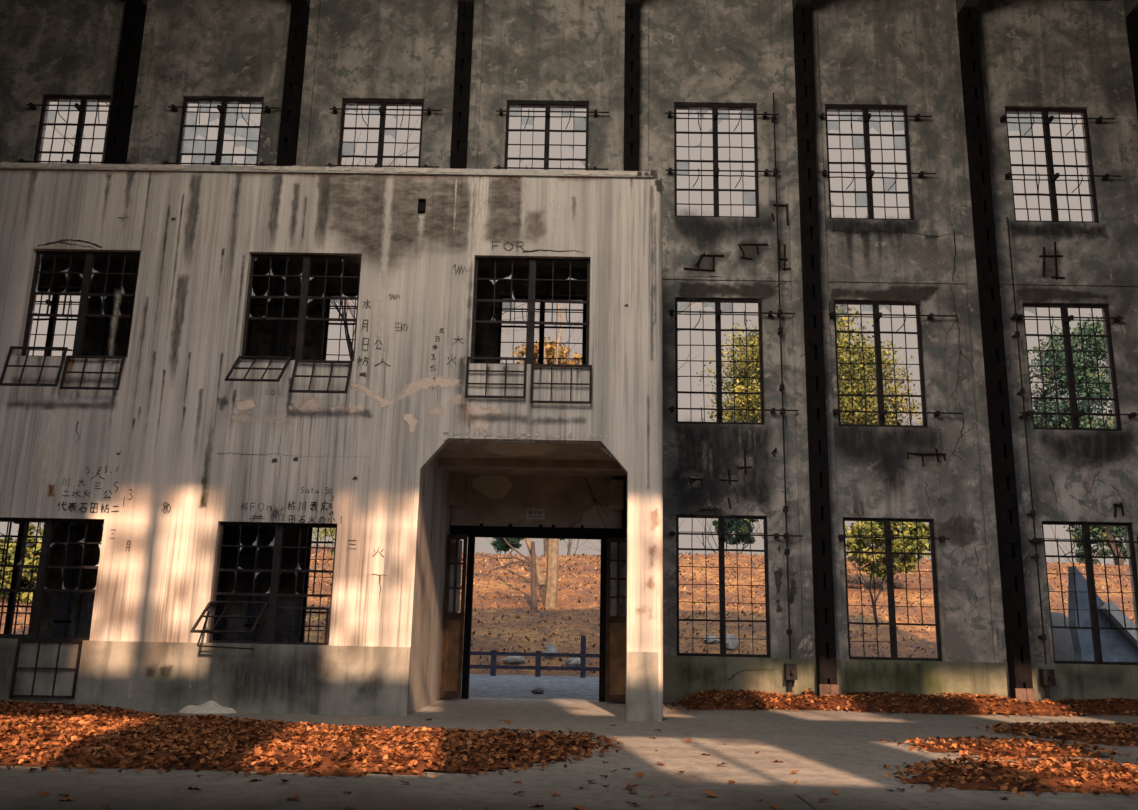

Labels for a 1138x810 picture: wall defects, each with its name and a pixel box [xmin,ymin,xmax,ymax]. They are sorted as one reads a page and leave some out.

water stain [164,176,199,255]
water stain [269,176,539,330]
water stain [150,279,191,394]
peeling [289,373,613,458]